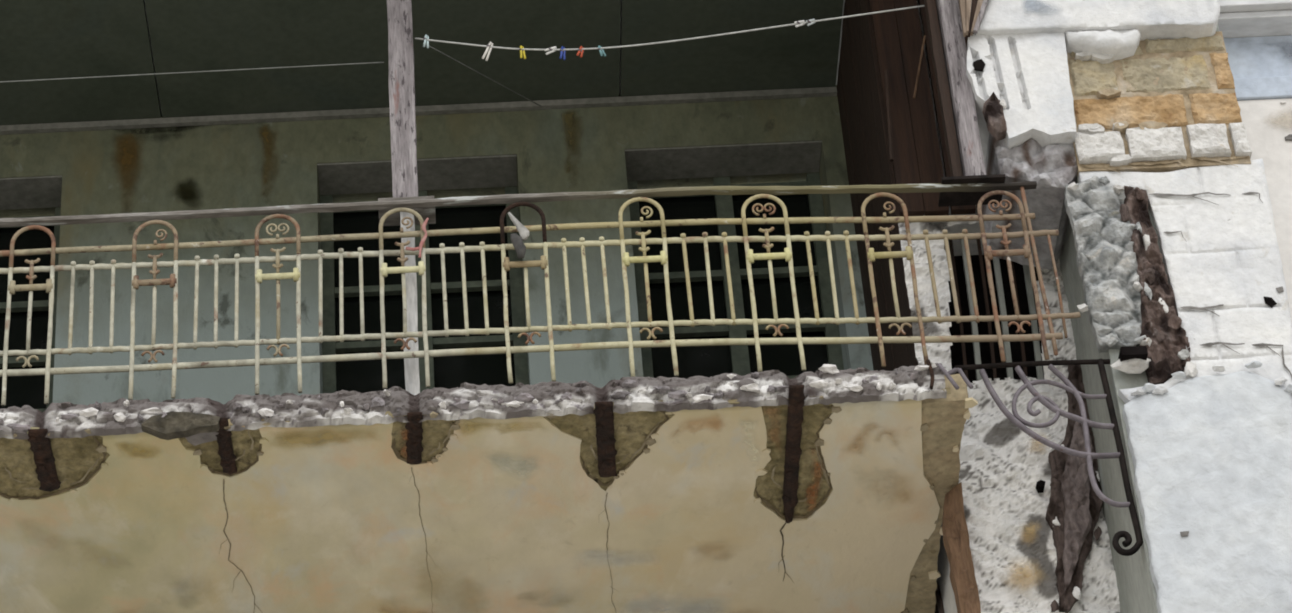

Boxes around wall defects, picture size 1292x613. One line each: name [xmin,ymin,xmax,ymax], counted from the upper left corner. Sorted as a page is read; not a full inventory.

spalling [973,59,985,72]
flaking render [981,31,1252,385]
crack [219,479,261,611]
crack [411,467,435,613]
spalling [0,359,978,613]
crack [599,493,616,610]
crack [778,523,794,583]
spalling [1036,365,1103,613]